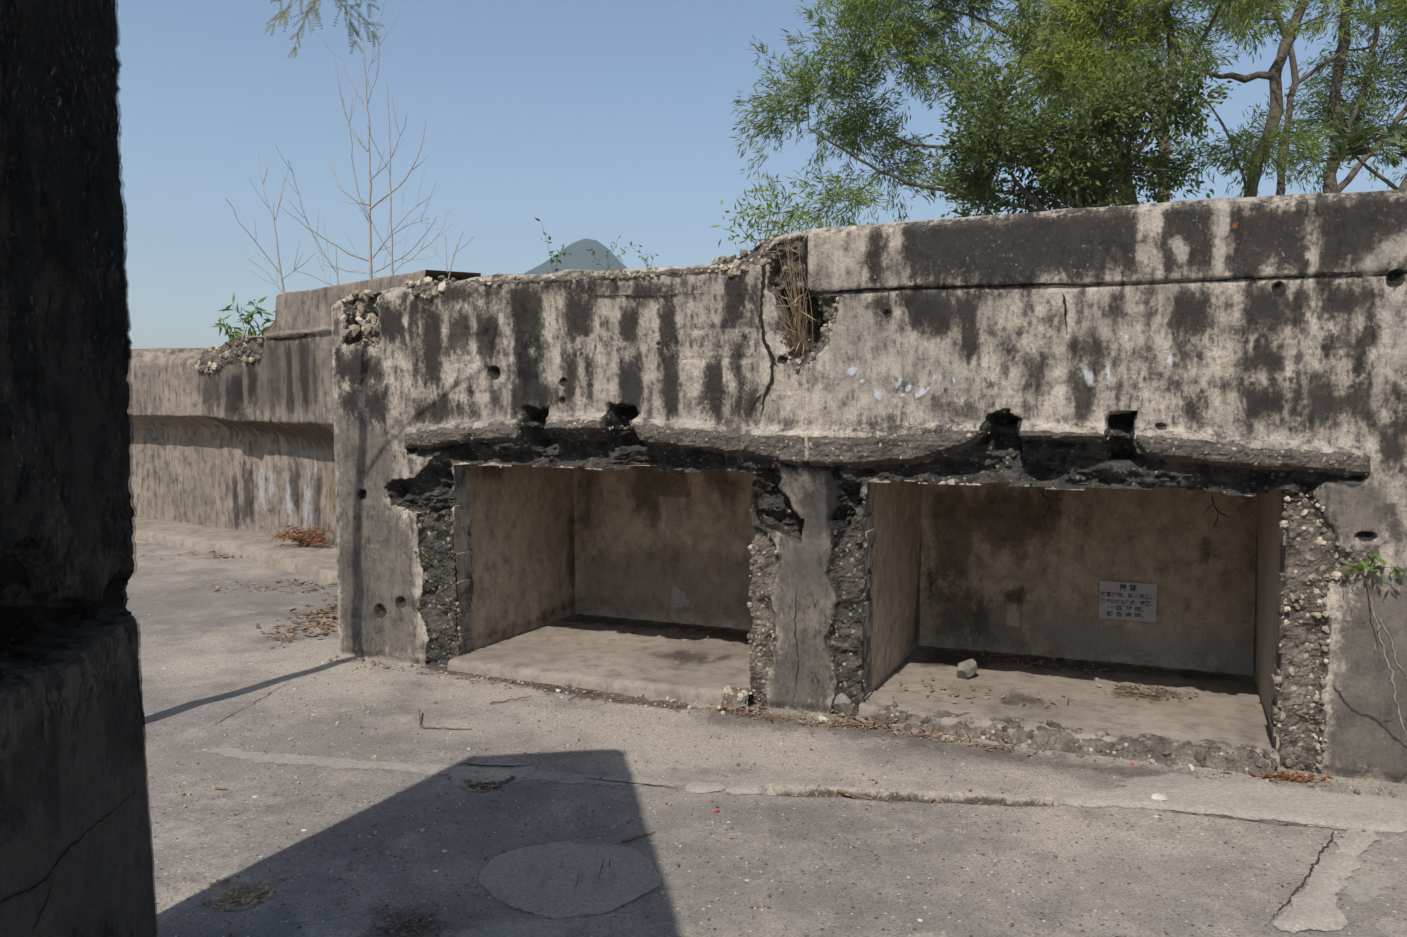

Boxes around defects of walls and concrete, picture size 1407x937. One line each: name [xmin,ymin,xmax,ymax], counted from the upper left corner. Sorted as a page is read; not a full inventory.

water stain [0,0,131,417]
spalling [340,289,382,348]
water stain [378,272,681,424]
crack [595,252,778,422]
crack [802,235,1112,334]
water stain [865,205,1145,364]
water stain [1159,191,1407,497]
spalling [0,551,129,667]
water stain [202,337,414,658]
spalling [374,376,1378,776]
crack [1331,570,1407,748]
crack [0,674,147,935]